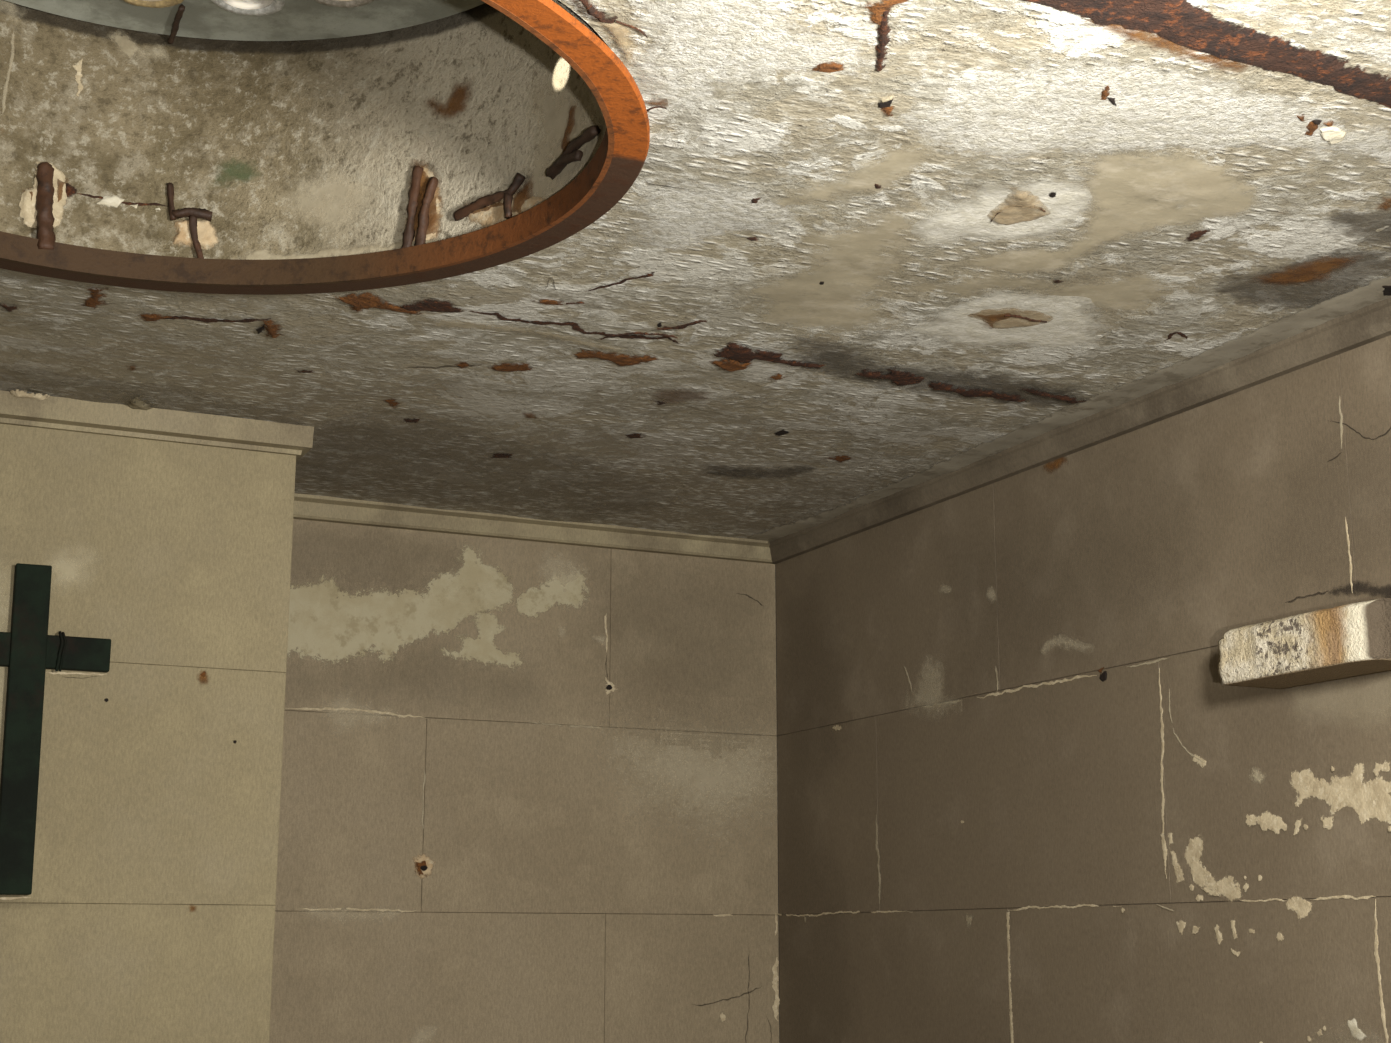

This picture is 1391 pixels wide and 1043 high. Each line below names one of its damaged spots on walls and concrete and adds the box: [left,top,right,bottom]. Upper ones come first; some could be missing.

rust [429,86,468,115]
rust [1101,86,1116,106]
rust [1297,114,1346,144]
spalling [19,161,77,250]
spalling [401,163,545,248]
damp [912,182,1092,246]
damp [1334,211,1391,243]
damp [914,280,1105,347]
rust [574,350,658,366]
crack [1327,421,1391,462]
flaking render [287,544,589,668]
flaking render [1246,760,1391,835]